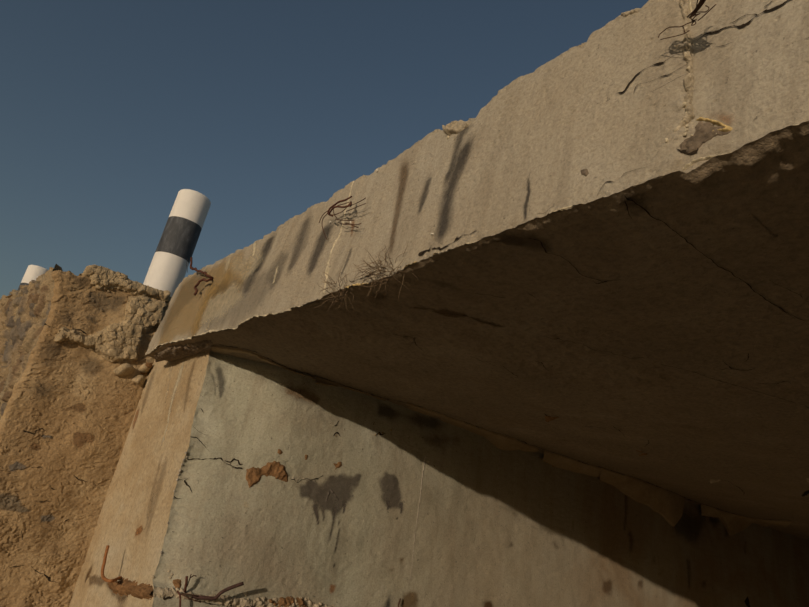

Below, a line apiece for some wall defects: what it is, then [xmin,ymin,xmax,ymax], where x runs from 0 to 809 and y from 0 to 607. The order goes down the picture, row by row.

crack [697,0,788,41]
crack [618,52,685,94]
leakage [439,144,470,236]
leakage [252,238,273,271]
leakage [310,227,330,271]
crack [596,167,804,321]
crack [187,408,243,469]
leakage [301,474,361,551]
leakage [381,474,403,519]